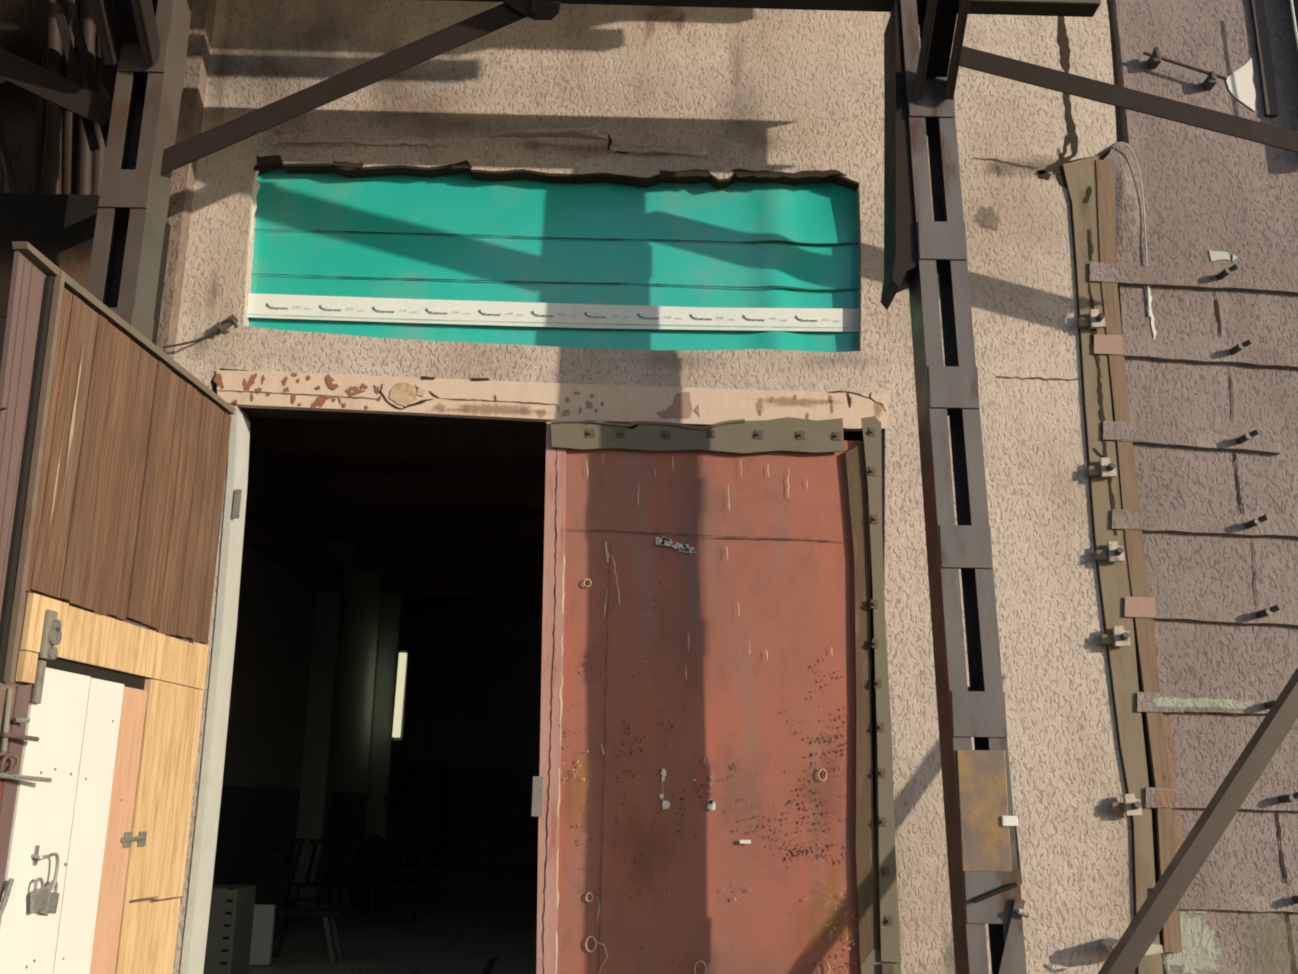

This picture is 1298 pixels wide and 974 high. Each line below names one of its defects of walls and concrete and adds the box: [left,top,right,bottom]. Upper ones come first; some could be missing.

crack [972,16,1078,175]
crack [608,134,630,153]
crack [996,186,1117,536]
peeling [214,373,381,409]
peeling [557,391,604,416]
peeling [656,392,700,419]
damp [1165,909,1220,974]